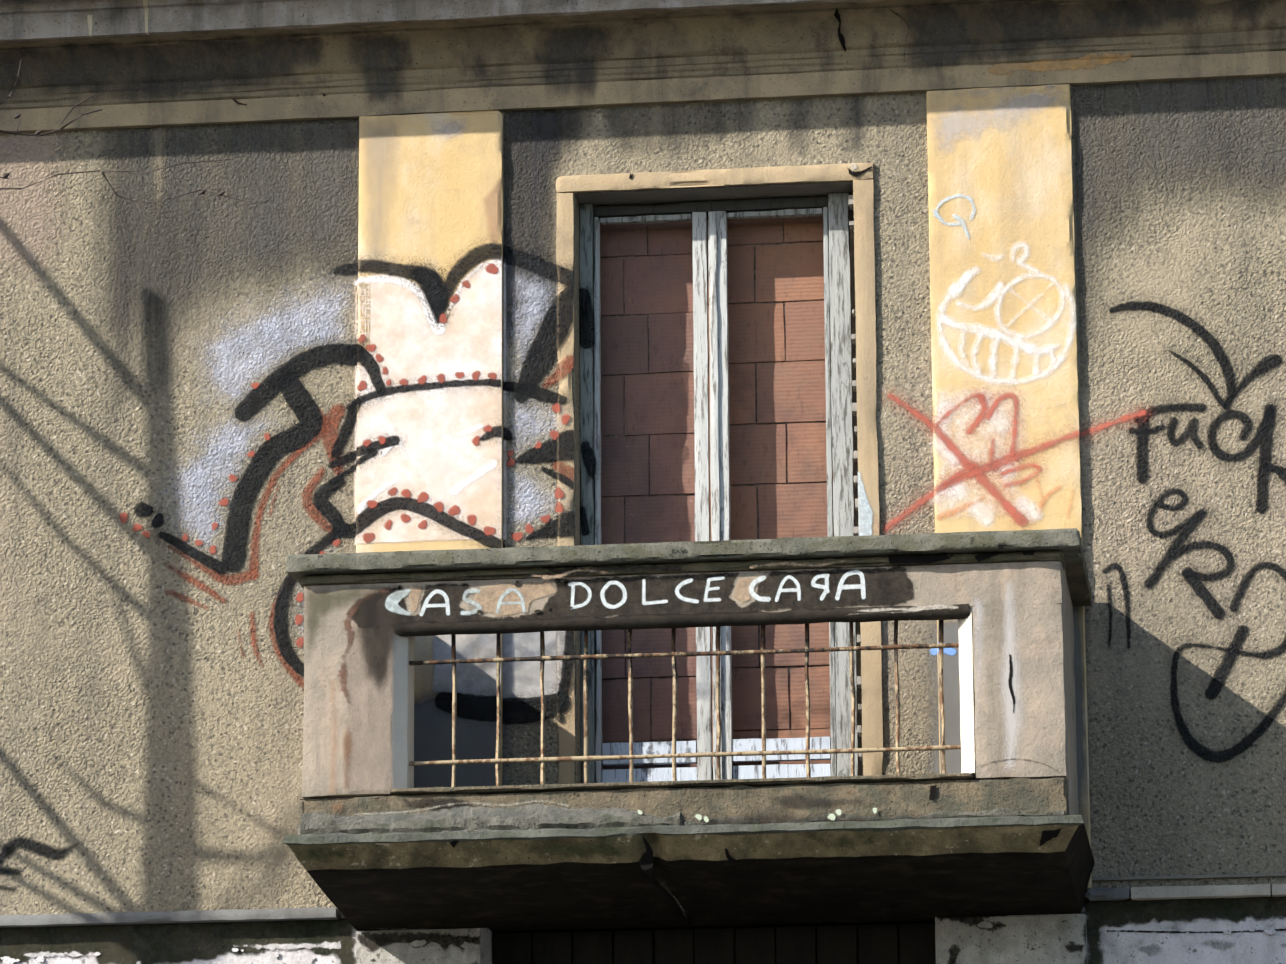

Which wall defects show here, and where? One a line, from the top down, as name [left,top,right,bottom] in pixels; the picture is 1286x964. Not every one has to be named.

damp [0,0,321,98]
damp [354,35,405,99]
damp [541,25,611,90]
crack [834,9,846,52]
damp [911,0,1198,66]
damp [116,118,359,317]
crack [1007,654,1015,712]
peeling [0,951,100,964]
peeling [232,941,341,964]